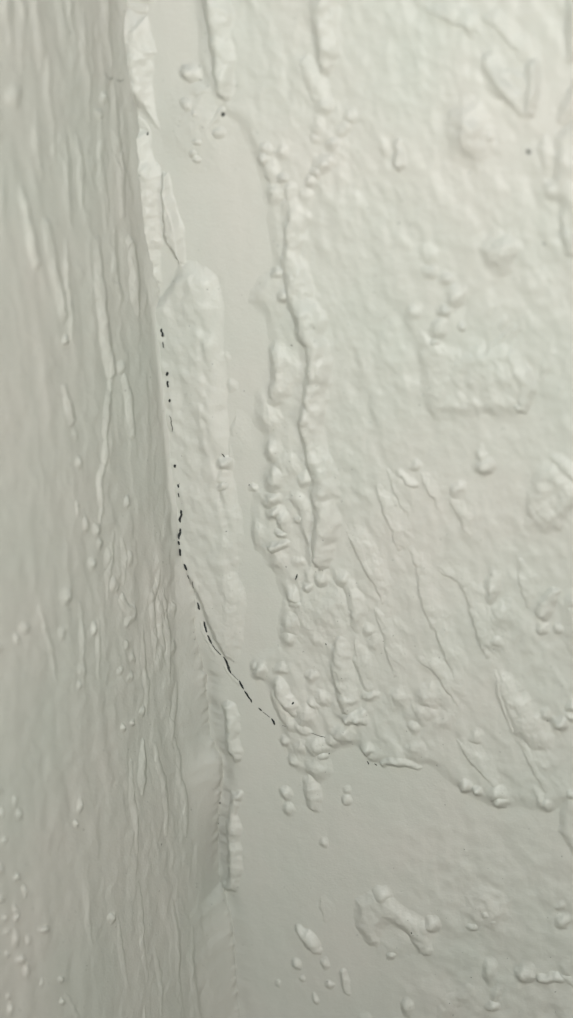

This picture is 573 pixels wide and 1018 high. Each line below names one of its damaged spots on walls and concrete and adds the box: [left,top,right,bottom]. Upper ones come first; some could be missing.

crack [173,465,286,727]